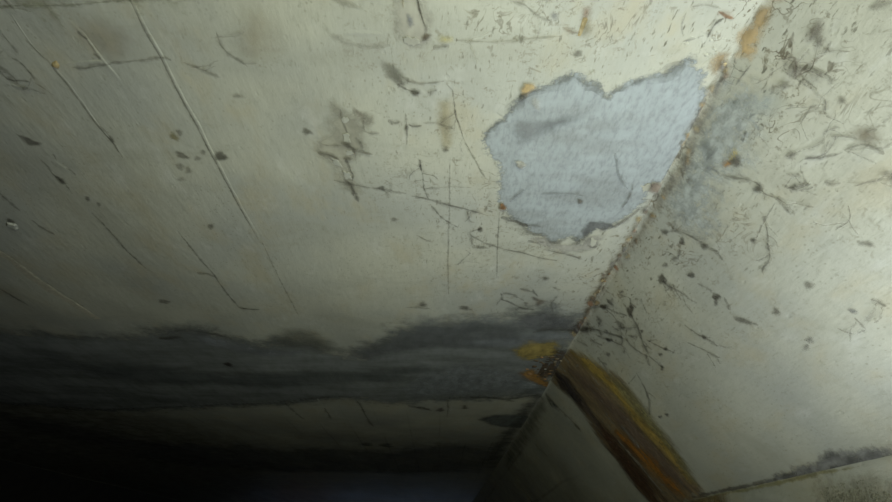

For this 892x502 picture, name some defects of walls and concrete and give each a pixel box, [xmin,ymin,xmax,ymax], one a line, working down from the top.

corrosion [740,9,768,54]
spalling [472,43,717,247]
leakage [0,307,581,411]
corrosion [514,340,722,502]